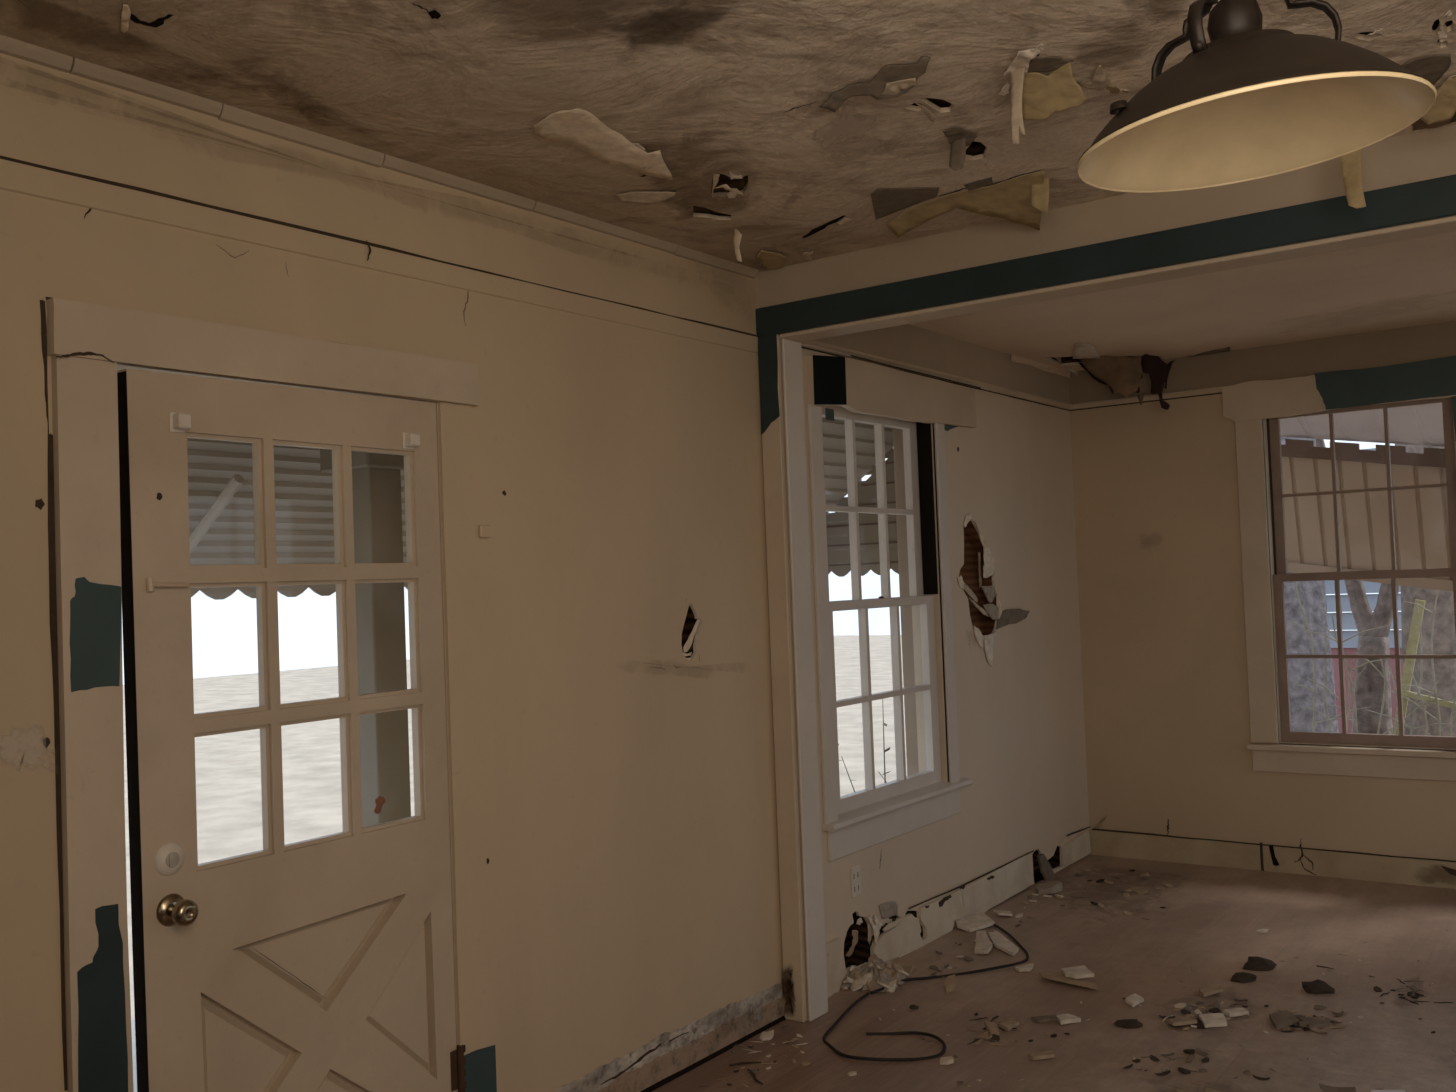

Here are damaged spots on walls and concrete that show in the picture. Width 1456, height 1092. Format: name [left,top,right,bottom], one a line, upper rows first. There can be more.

peeling [998,44,1129,144]
peeling [1402,19,1455,85]
peeling [533,108,676,204]
peeling [871,138,1049,238]
peeling [1314,355,1456,440]
peeling [70,577,121,692]
spalling [682,603,702,663]
spalling [957,513,1030,666]
spalling [844,885,965,972]
peeling [77,904,128,1092]
peeling [464,1045,497,1092]
flaking render [555,982,786,1092]